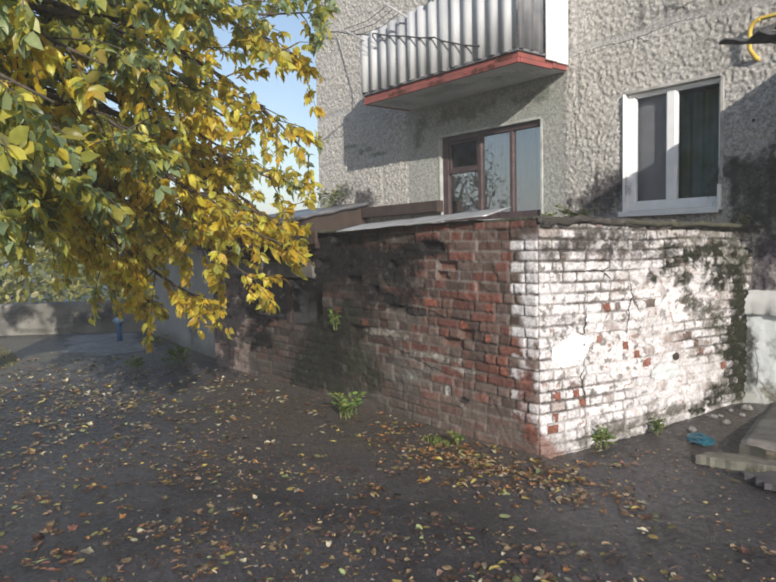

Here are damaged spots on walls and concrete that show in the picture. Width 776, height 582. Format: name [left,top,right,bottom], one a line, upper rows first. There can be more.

leakage [567,171,623,214]
leakage [598,144,776,437]
crack [580,307,592,401]
peeling [622,341,651,367]
peeling [500,367,534,396]
peeling [522,411,559,439]